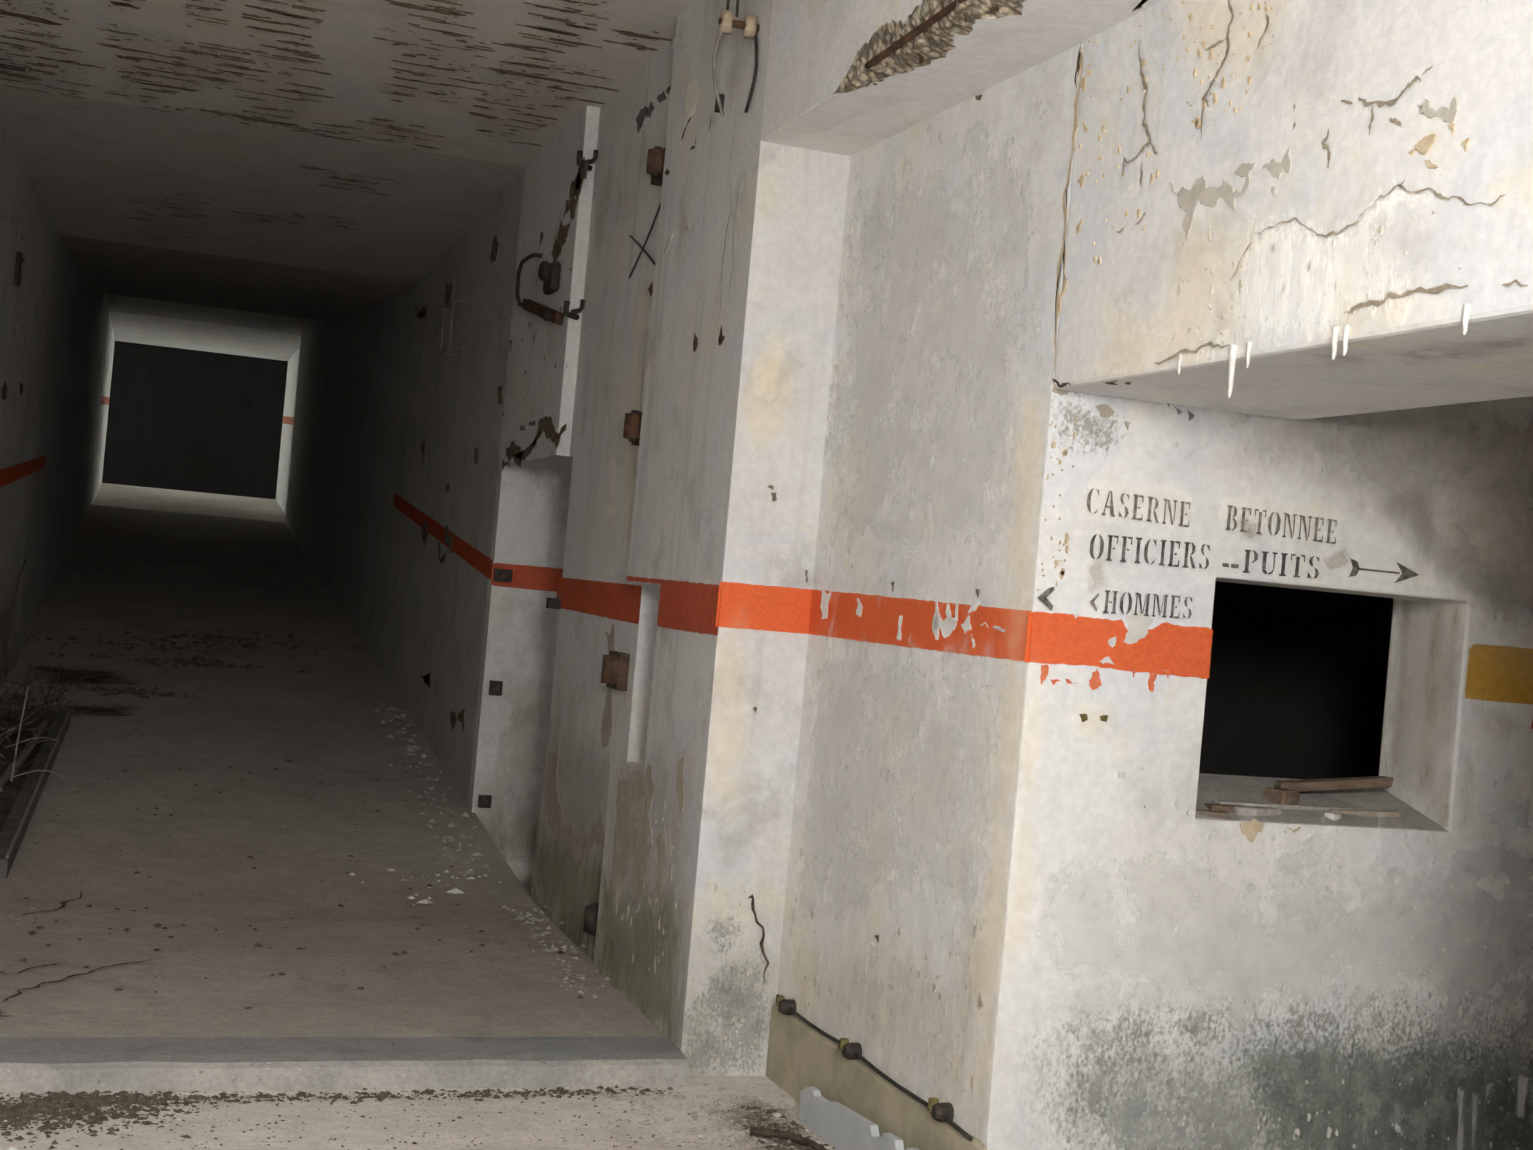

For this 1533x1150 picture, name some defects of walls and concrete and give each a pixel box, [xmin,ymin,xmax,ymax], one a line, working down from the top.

spalling [833,0,1026,94]
crack [1200,0,1269,139]
peeling [1408,96,1471,169]
spalling [540,157,589,271]
crack [1051,43,1082,388]
peeling [1146,140,1292,246]
crack [1229,180,1506,281]
crack [1344,279,1528,314]
peeling [932,589,1005,648]
peeling [1040,609,1153,690]
crack [748,894,770,984]
damp [1075,977,1533,1150]